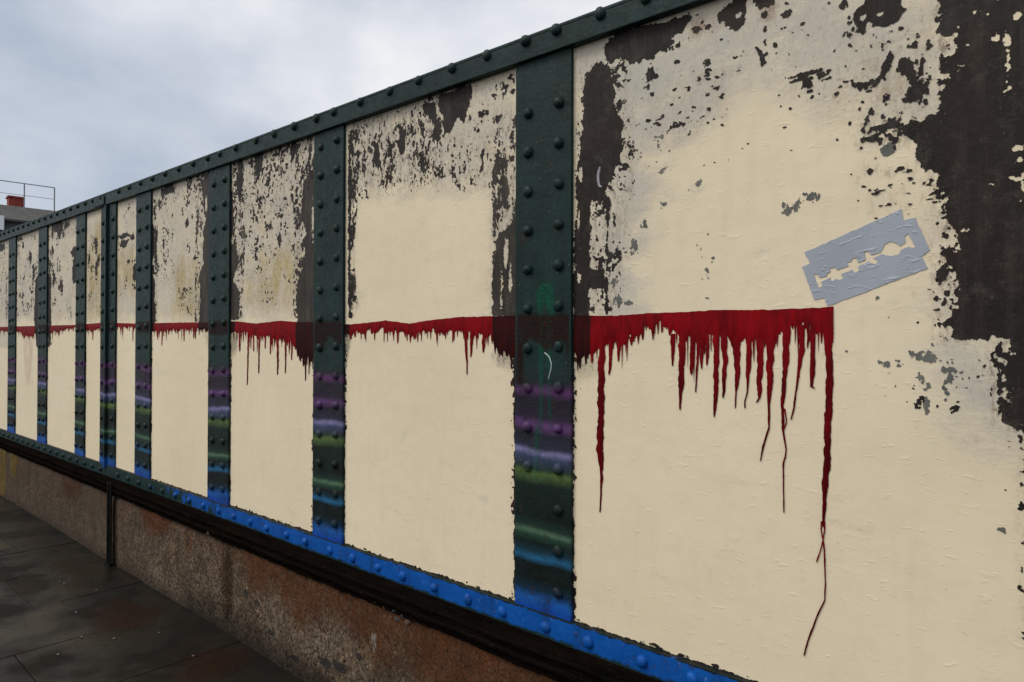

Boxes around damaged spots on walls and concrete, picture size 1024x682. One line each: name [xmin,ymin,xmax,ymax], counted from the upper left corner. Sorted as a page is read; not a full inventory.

peeling [0,221,101,347]
peeling [152,172,209,323]
peeling [231,137,314,322]
peeling [347,73,516,318]
peeling [573,0,809,316]
peeling [781,0,1024,487]